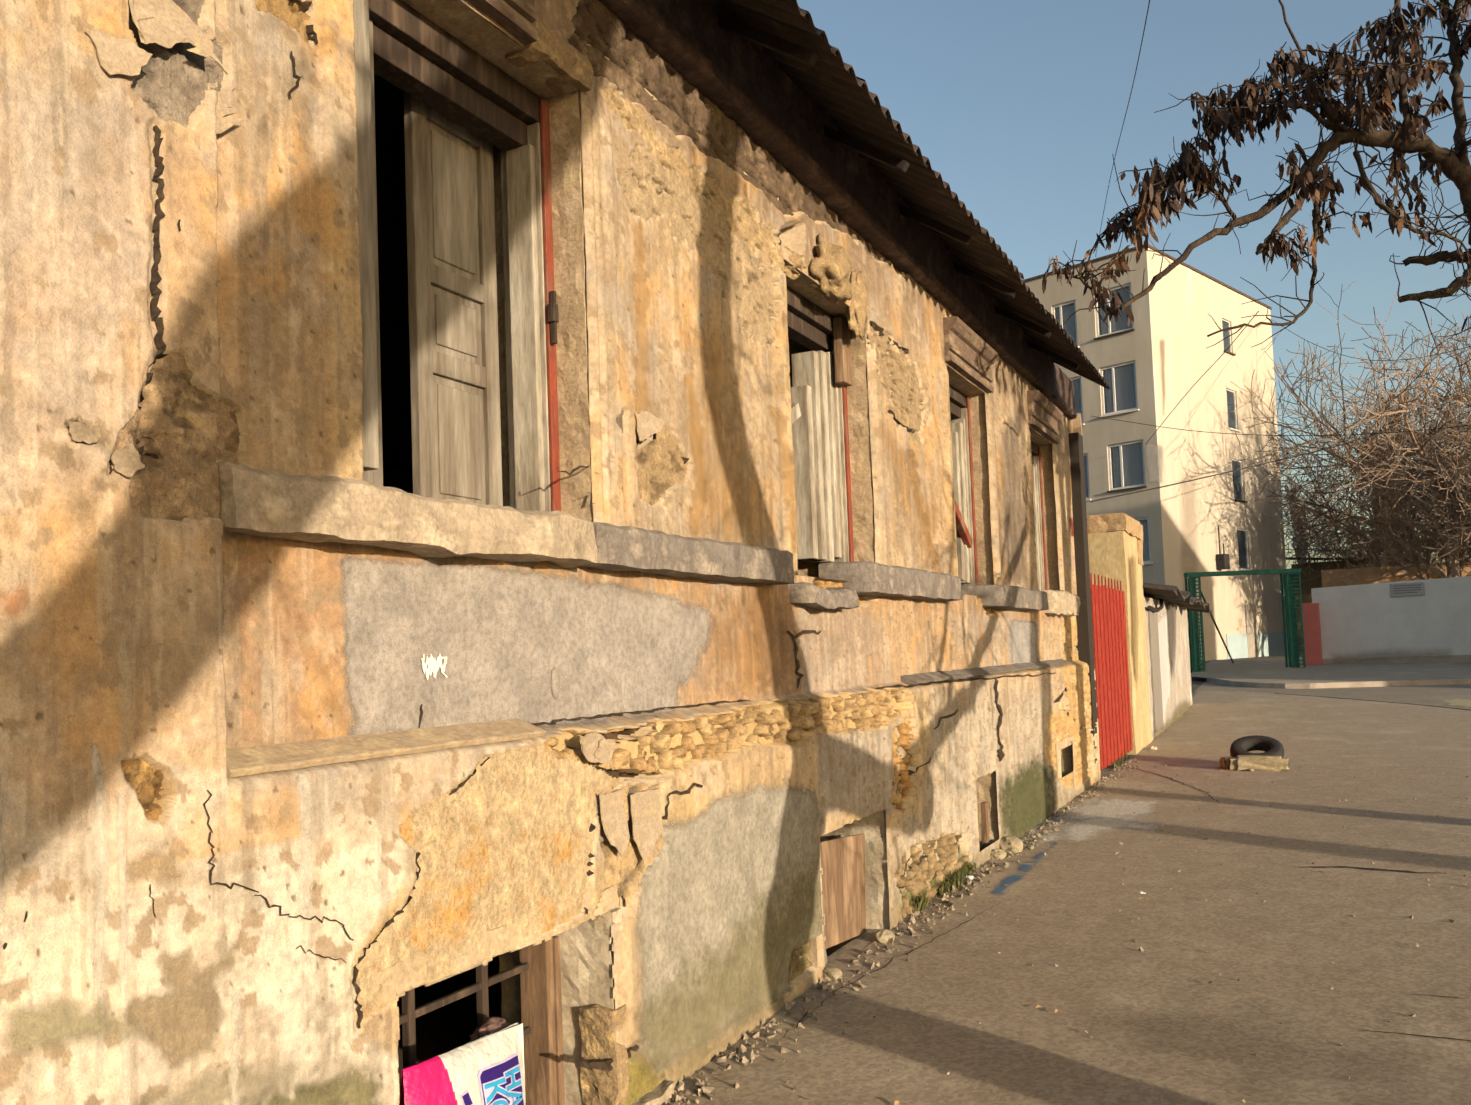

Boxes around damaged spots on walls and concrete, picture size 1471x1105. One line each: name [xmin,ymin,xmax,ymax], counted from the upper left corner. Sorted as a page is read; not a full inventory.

flaking render [85,0,243,134]
crack [109,125,181,474]
flaking render [598,87,785,349]
flaking render [65,353,240,521]
flaking render [616,410,688,506]
flaking render [121,758,164,821]
crack [203,790,421,1029]
crack [451,757,490,794]
peeling [357,687,915,1019]
flaking render [893,833,969,919]
crack [876,673,1067,783]
flaking render [1045,616,1095,789]